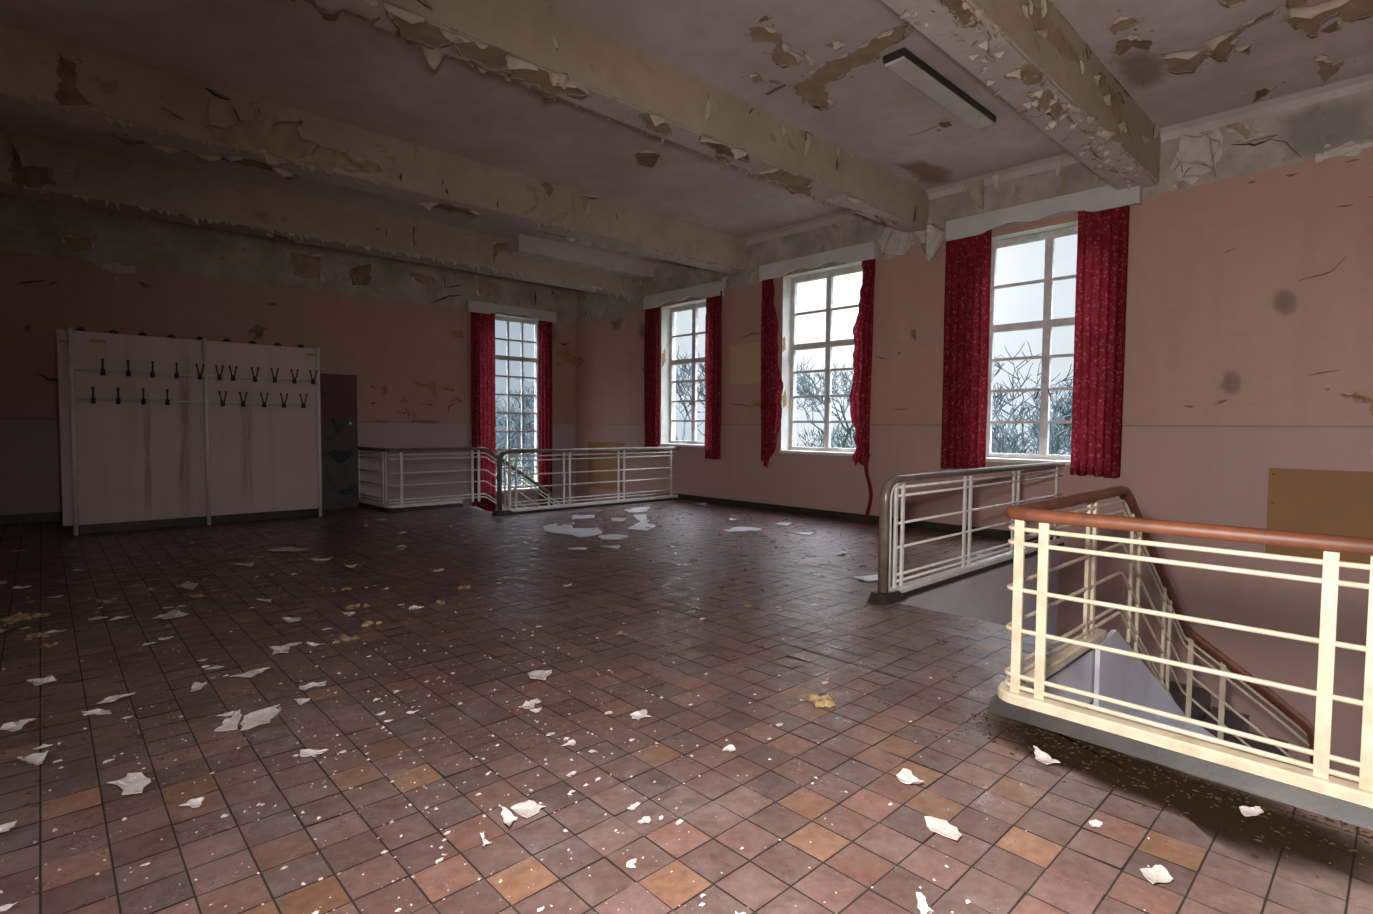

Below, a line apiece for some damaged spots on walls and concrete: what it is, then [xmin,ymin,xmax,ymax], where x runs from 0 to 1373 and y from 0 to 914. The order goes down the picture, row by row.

peeling [52,46,98,107]
peeling [742,0,1373,190]
crack [1298,256,1347,282]
peeling [1325,388,1373,416]